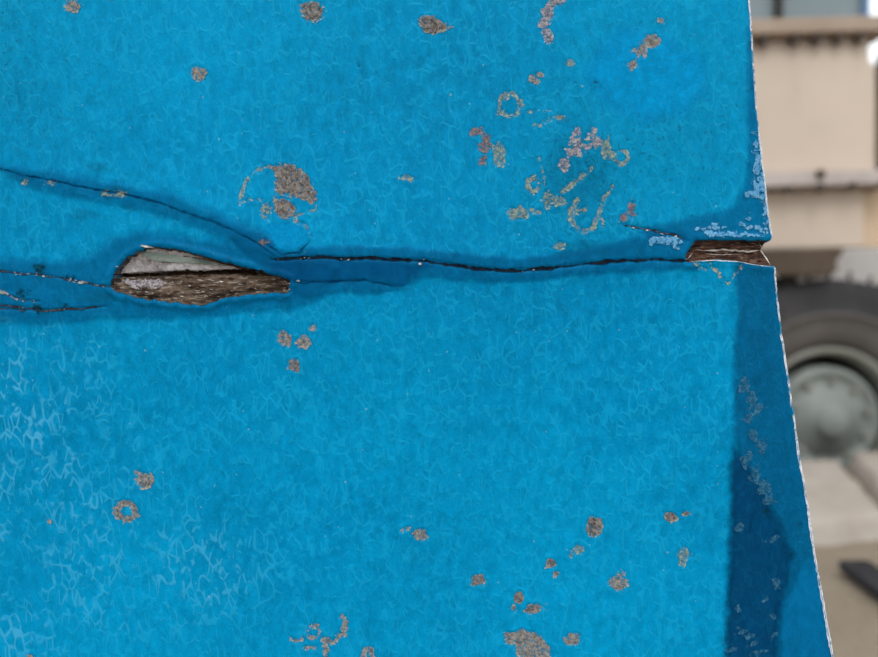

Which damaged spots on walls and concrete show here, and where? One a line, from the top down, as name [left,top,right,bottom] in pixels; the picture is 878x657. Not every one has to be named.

peeling [538,0,565,43]
peeling [628,34,661,71]
peeling [470,127,505,168]
peeling [558,127,630,172]
peeling [239,163,317,228]
peeling [507,166,614,234]
crack [0,168,687,286]
crack [0,270,114,312]
spalling [111,245,290,305]
spalling [685,240,771,285]
peeling [112,500,141,524]
peeling [290,614,348,657]